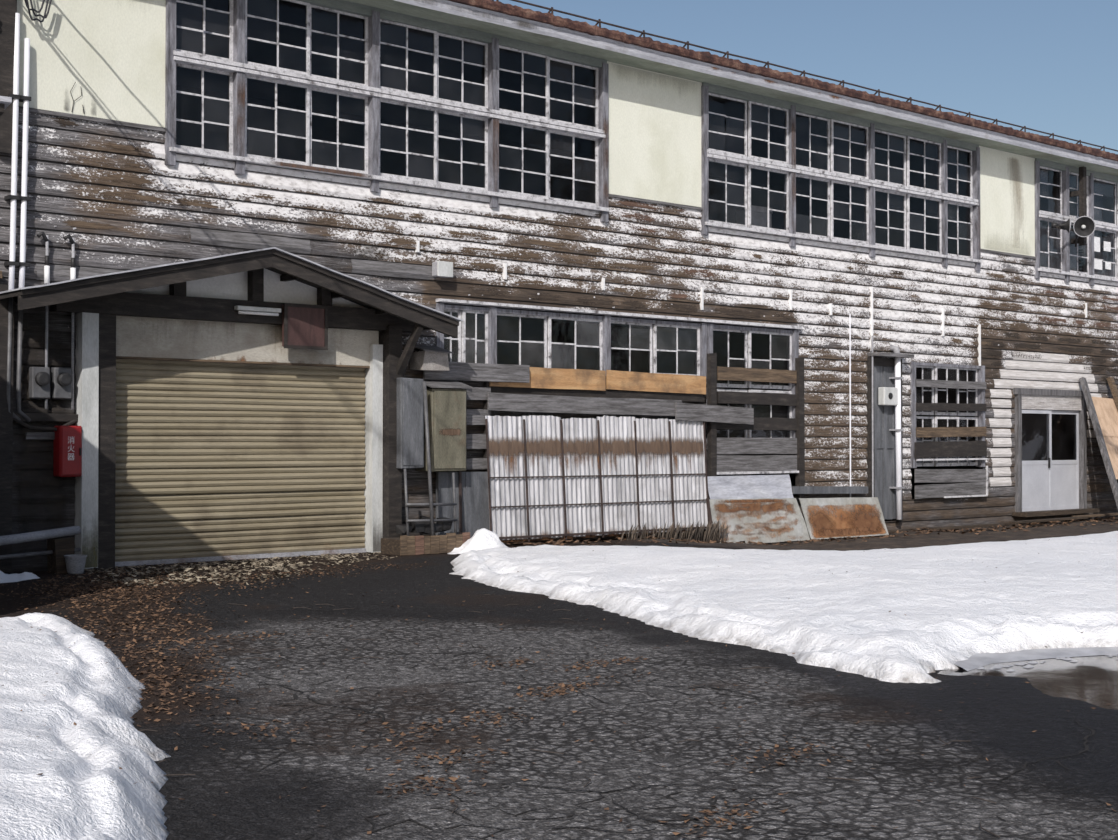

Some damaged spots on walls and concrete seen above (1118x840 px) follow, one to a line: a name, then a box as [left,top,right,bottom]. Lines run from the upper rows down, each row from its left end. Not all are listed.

peeling [52,117,78,127]
peeling [93,141,223,209]
peeling [613,199,659,236]
peeling [374,236,433,260]
peeling [448,231,659,271]
peeling [980,273,1118,329]
peeling [805,350,865,478]
rust [488,438,704,468]
rust [500,497,889,544]